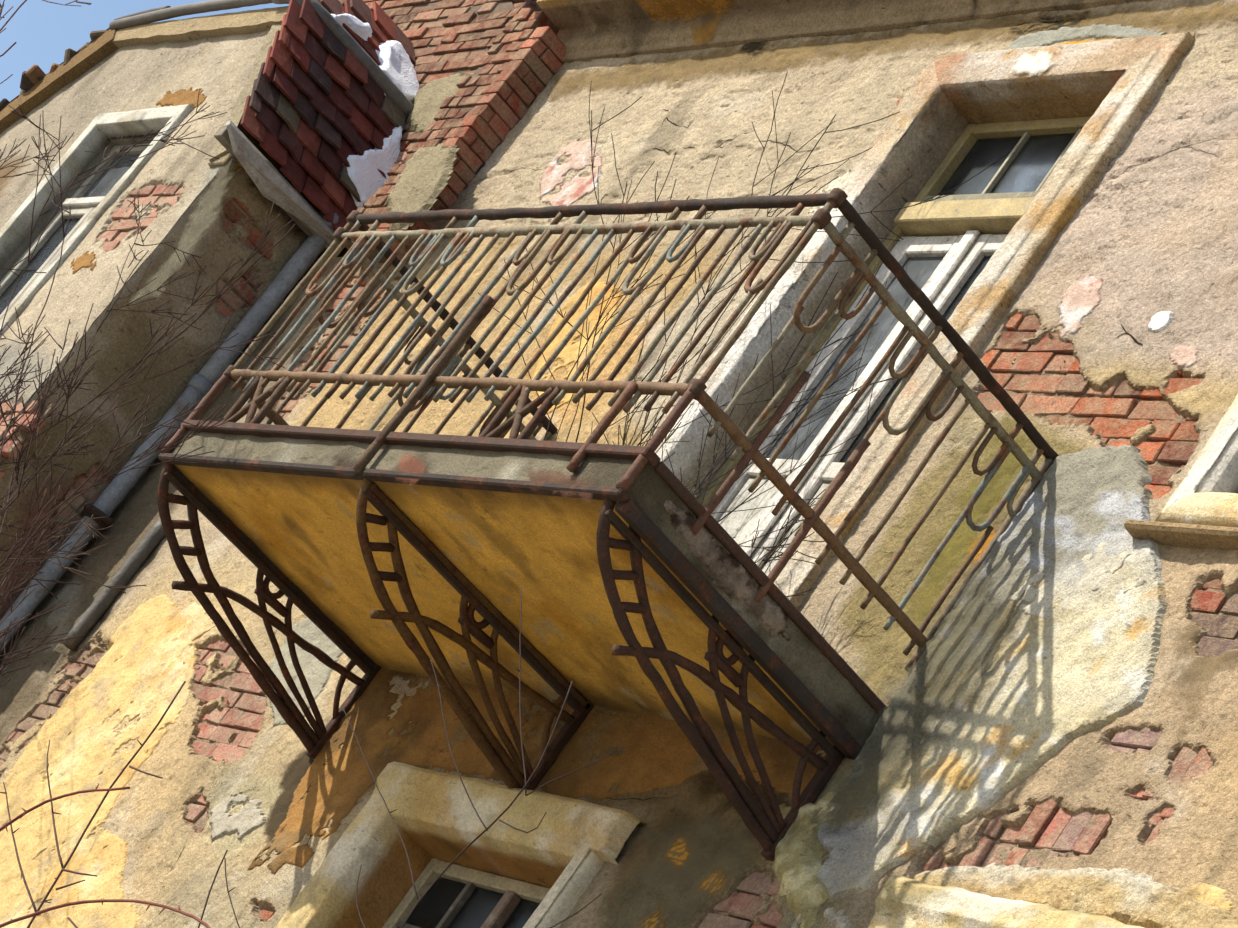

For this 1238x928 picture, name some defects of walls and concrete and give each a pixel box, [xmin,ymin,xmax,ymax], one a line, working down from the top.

spalling [538,138,604,206]
crack [1117,82,1237,177]
flaking render [70,184,207,275]
flaking render [977,274,1203,499]
flaking render [0,400,53,480]
rust [973,532,995,559]
flaking render [1190,577,1238,657]
peeling [0,594,343,928]
peeling [186,668,827,875]
water stain [815,568,1012,832]
flaking render [1104,727,1162,754]
flaking render [923,799,1112,872]